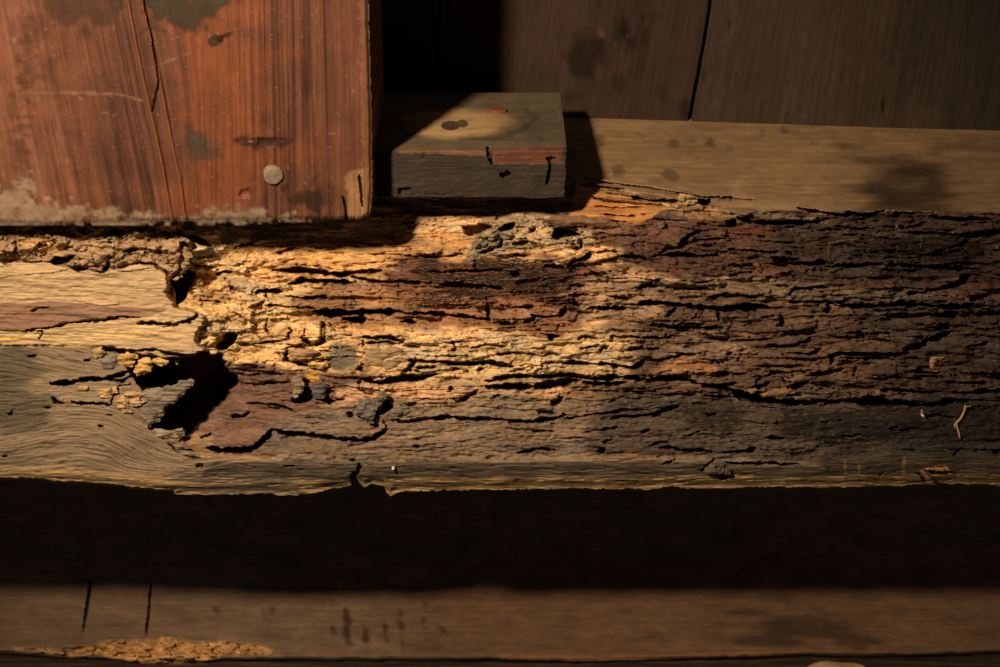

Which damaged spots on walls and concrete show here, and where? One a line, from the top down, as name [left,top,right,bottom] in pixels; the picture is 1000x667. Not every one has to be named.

water stain [143,0,228,30]
crack [143,0,160,111]
water stain [0,171,322,225]
crack [343,176,364,215]
water stain [864,168,951,218]
crack [27,313,198,406]
spalling [0,242,239,456]
crack [208,190,1000,480]
crack [83,581,92,632]
crack [145,584,153,636]